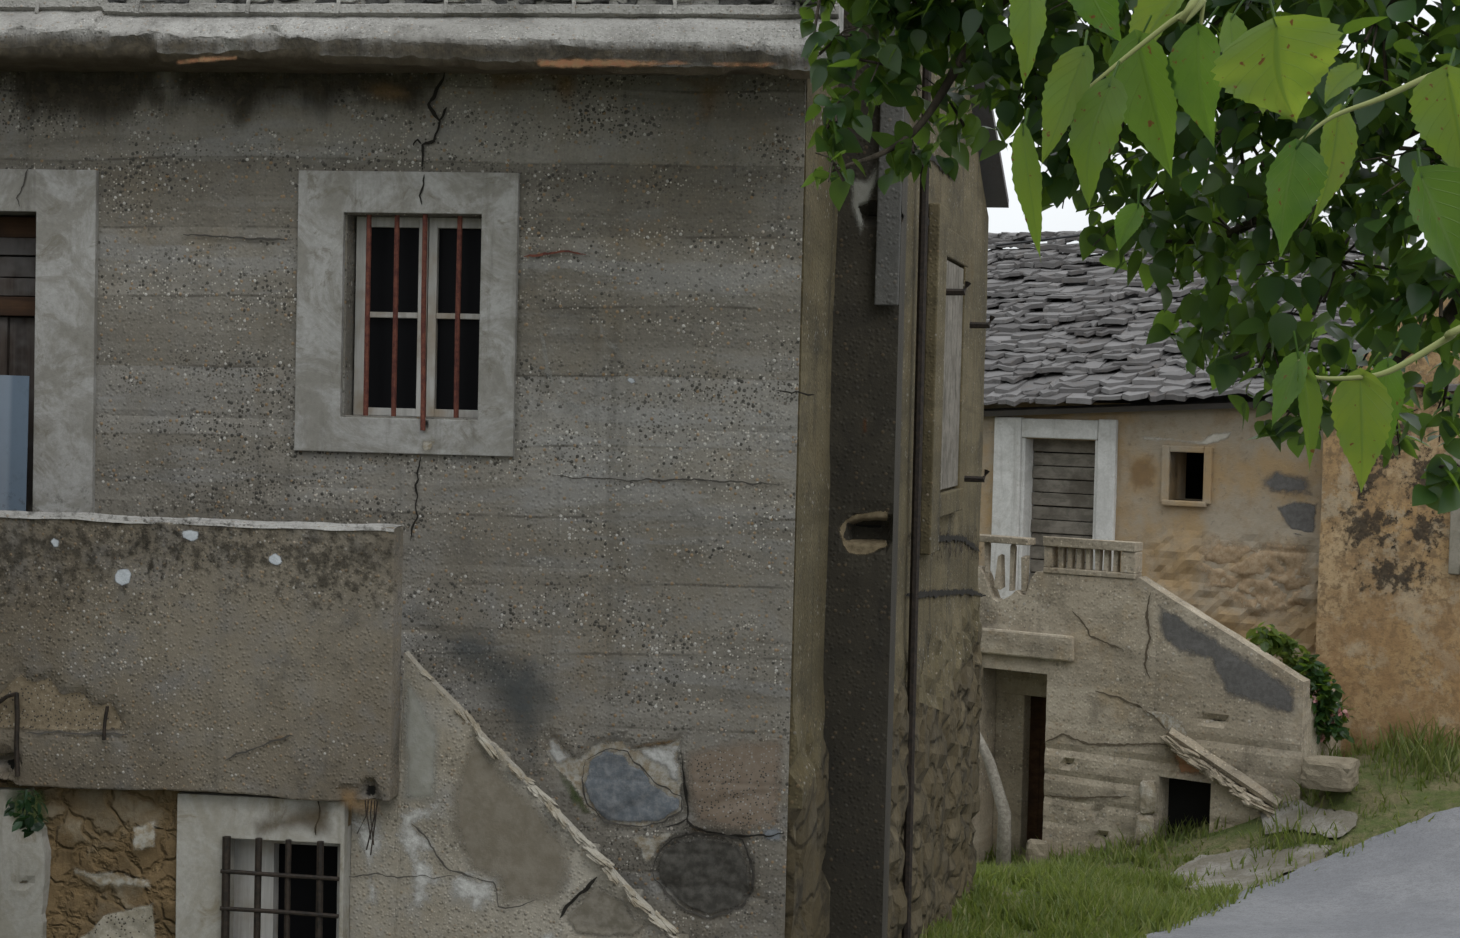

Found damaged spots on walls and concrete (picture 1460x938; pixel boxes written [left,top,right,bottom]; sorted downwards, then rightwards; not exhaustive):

crack [413,73,447,204]
damp [1331,383,1453,596]
spalling [0,675,124,770]
crack [1044,592,1167,746]
crack [349,873,597,918]